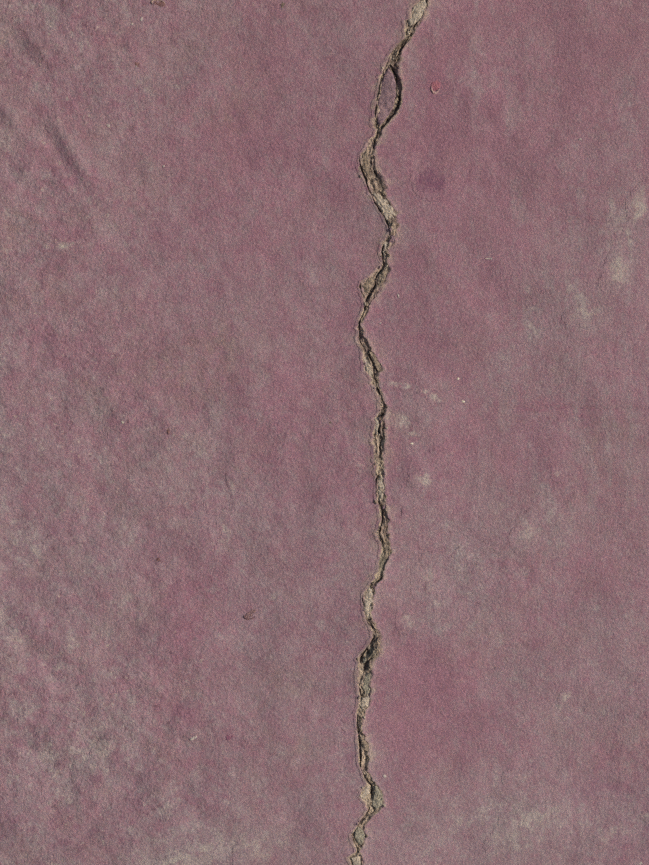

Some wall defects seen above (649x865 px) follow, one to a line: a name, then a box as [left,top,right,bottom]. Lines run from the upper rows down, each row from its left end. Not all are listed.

crack [345,0,431,865]